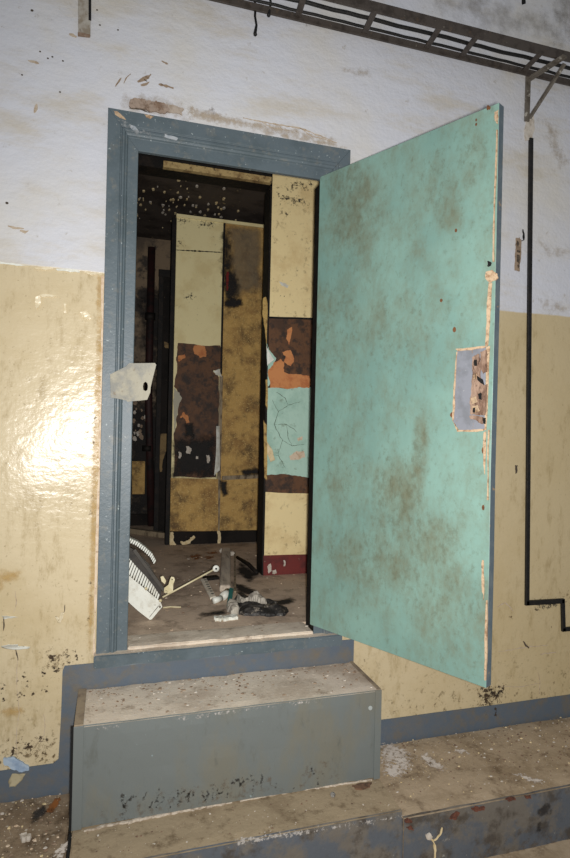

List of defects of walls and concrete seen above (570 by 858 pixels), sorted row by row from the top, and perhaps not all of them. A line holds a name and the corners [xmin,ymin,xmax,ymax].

spalling [115,74,174,89]
spalling [113,98,184,135]
leakage [191,108,337,145]
peeling [173,343,222,478]
peeling [265,316,313,494]
crack [272,393,304,466]
leakage [10,647,78,714]
leakage [477,683,540,717]
peeling [3,756,29,787]